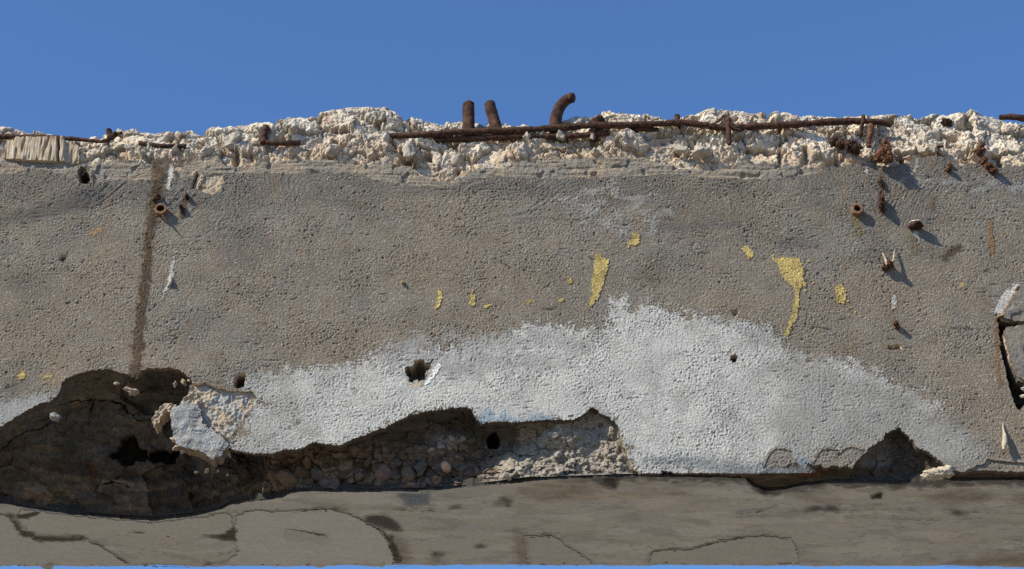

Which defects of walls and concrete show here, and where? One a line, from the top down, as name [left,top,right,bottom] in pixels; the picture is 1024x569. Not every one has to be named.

spalling [389,92,893,148]
spalling [999,113,1024,122]
spalling [0,131,123,143]
spalling [138,141,186,149]
spalling [258,124,301,146]
crack [943,266,1024,410]
crack [60,399,149,425]
peeling [0,291,1024,569]